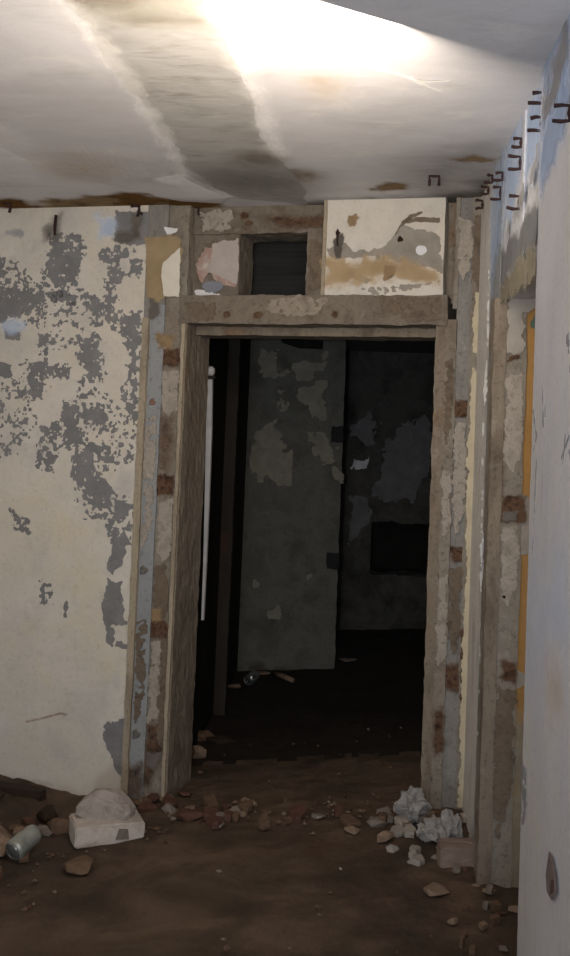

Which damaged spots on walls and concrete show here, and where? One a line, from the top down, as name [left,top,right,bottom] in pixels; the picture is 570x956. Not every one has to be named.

corrosion [0,193,222,209]
peeling [195,273,237,295]
spalling [264,226,443,317]
spalling [379,296,441,324]
spalling [457,216,490,353]
peeling [249,349,369,486]
spalling [503,373,524,472]
peeling [0,210,181,776]
peeling [347,358,488,808]
spalling [499,495,530,606]
spalling [546,851,557,900]